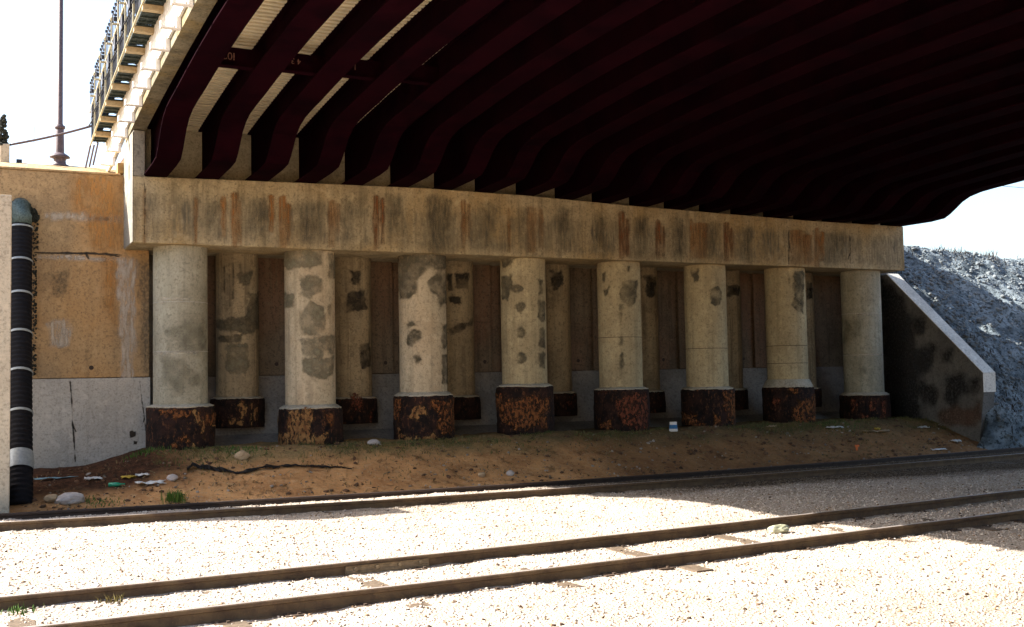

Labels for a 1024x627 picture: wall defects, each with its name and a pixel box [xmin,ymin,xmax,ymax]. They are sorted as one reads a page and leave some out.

corrosion [373,195,385,244]
water stain [862,280,979,419]
crack [68,381,76,462]